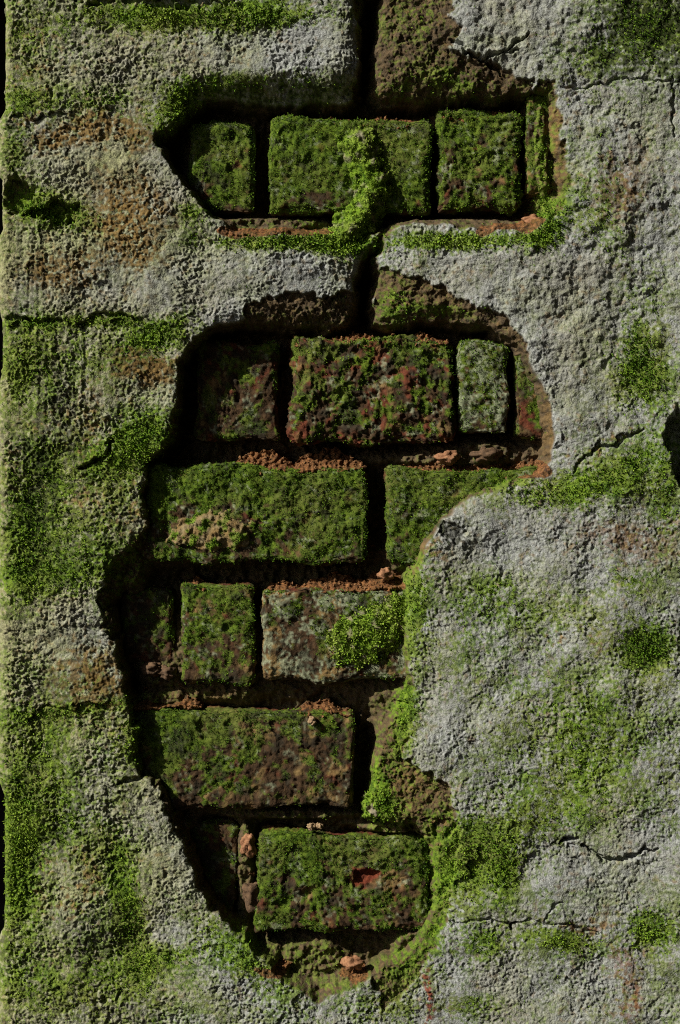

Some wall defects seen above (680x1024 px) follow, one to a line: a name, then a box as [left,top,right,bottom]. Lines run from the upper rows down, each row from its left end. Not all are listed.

crack [451,33,530,77]
flaking render [154,0,573,241]
crack [574,428,646,474]
flaking render [96,267,557,1012]
crack [559,836,660,864]
crack [450,902,601,935]